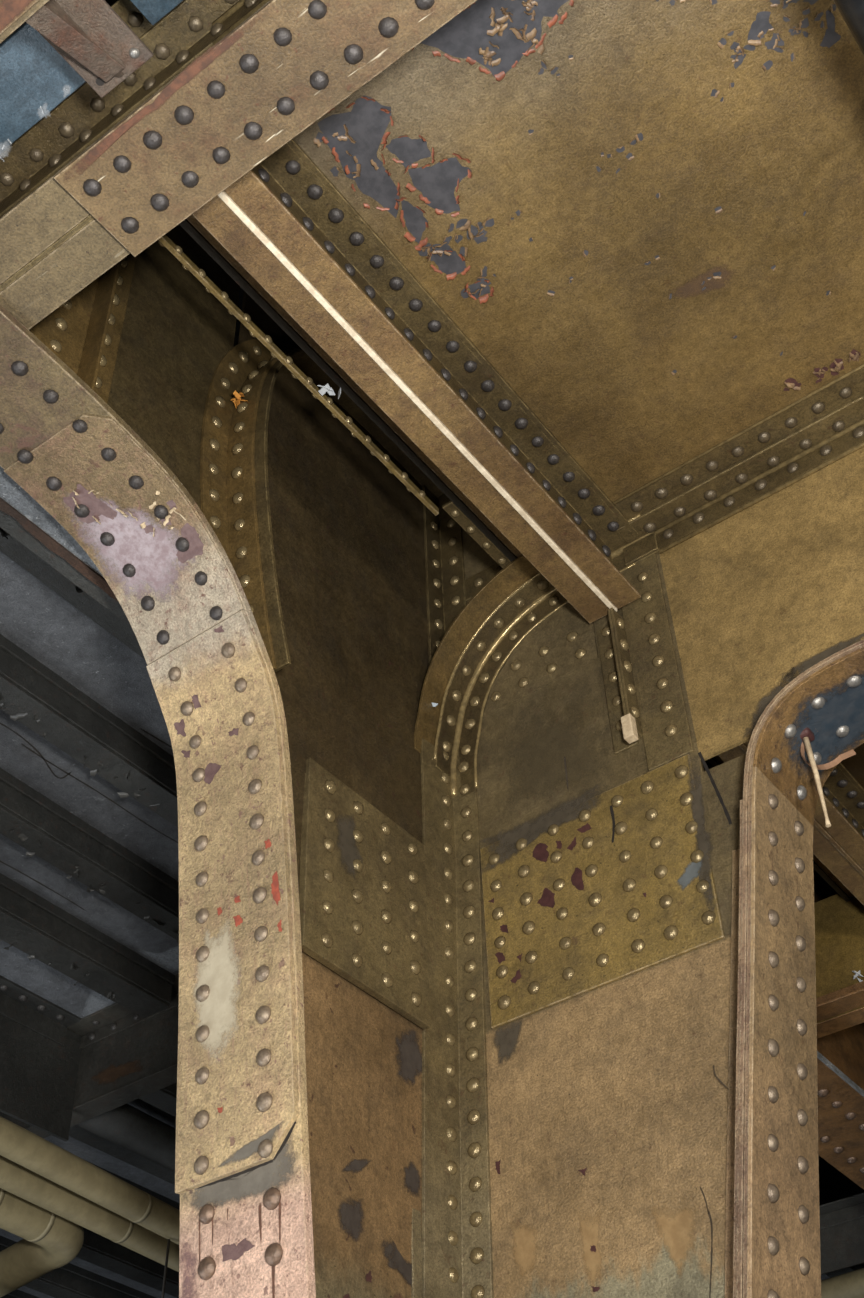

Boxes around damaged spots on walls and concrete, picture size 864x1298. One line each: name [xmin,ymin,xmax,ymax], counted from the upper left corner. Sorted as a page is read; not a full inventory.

peeling [412,0,574,81]
peeling [710,0,841,102]
peeling [311,95,496,304]
peeling [63,484,204,599]